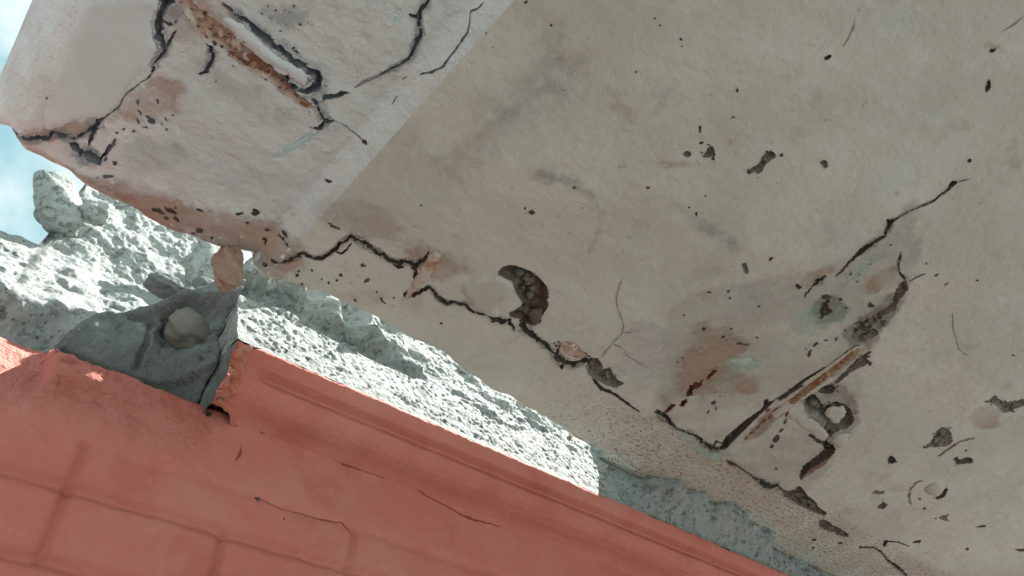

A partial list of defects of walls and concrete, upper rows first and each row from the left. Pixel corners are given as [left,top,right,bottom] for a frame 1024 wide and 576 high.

crack [13,0,177,166]
crack [199,43,217,83]
crack [221,0,484,140]
spalling [747,150,783,178]
crack [795,179,968,298]
spalling [462,265,549,326]
crack [280,223,782,491]
spalling [553,341,624,389]
rust [665,333,748,413]
spalling [721,281,909,549]
spalling [985,395,1024,413]
crack [415,489,499,527]